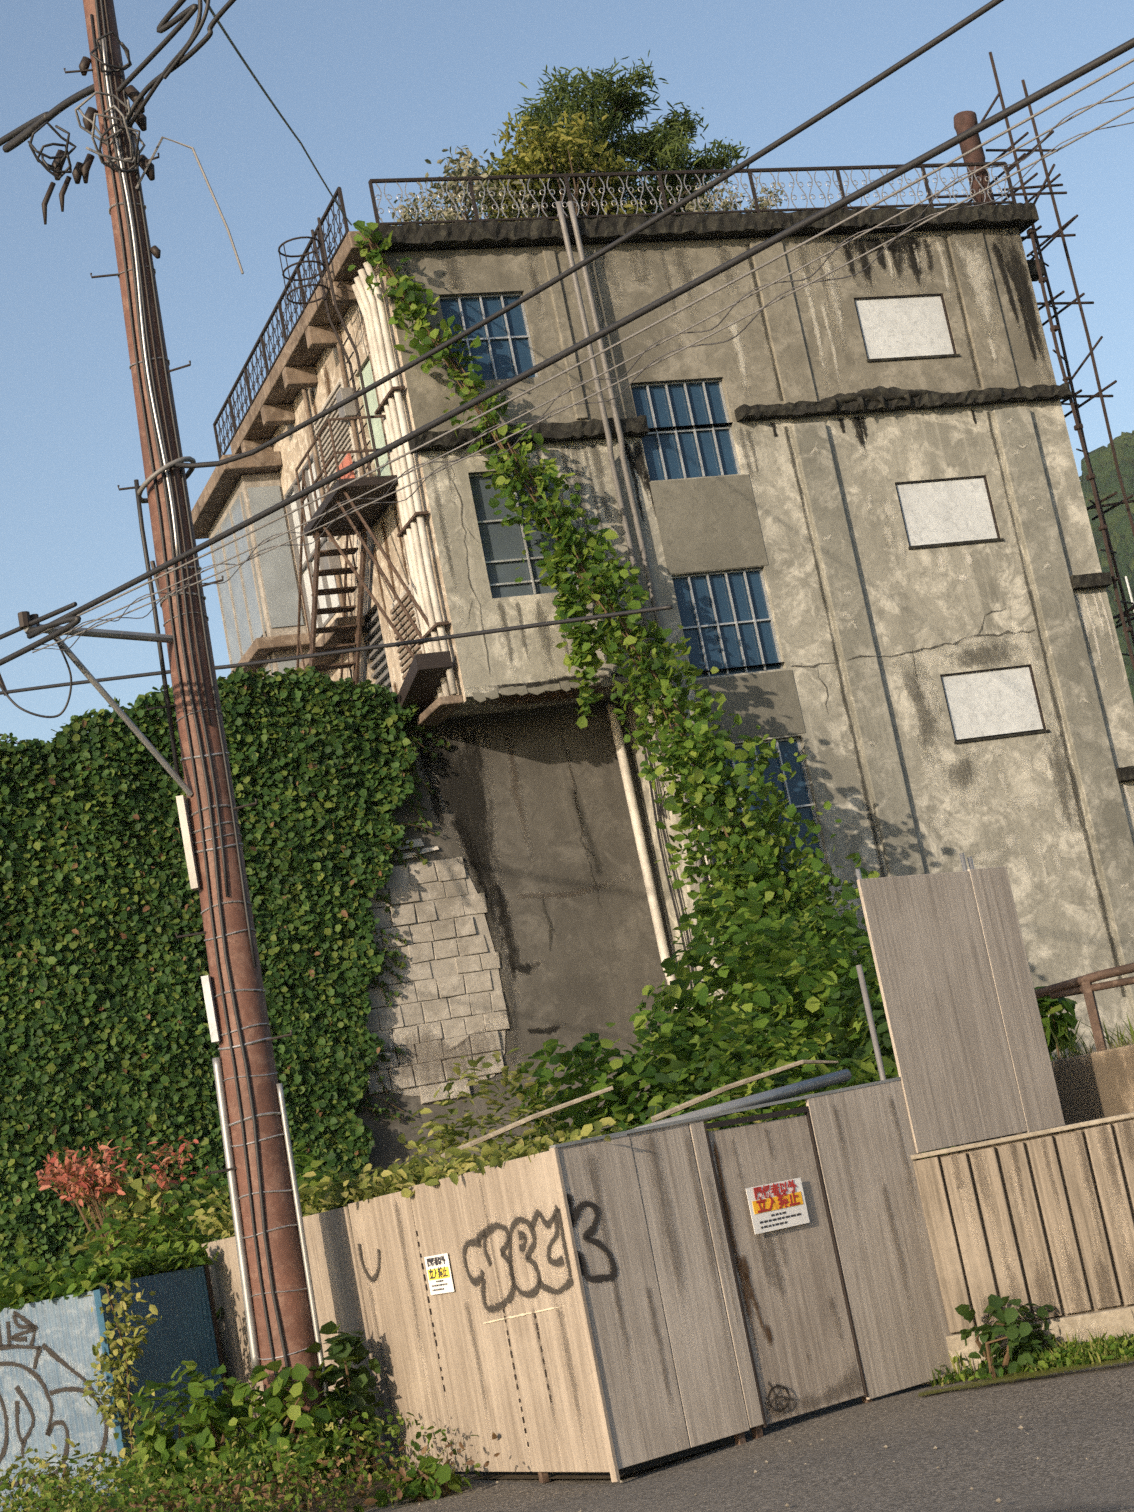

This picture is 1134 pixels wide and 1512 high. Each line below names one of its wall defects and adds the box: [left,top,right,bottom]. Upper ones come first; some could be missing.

water stain [730,324,745,375]
water stain [803,236,980,384]
water stain [993,233,1044,360]
crack [792,608,1035,713]
water stain [959,1043,1134,1149]
rust [714,1143,772,1343]